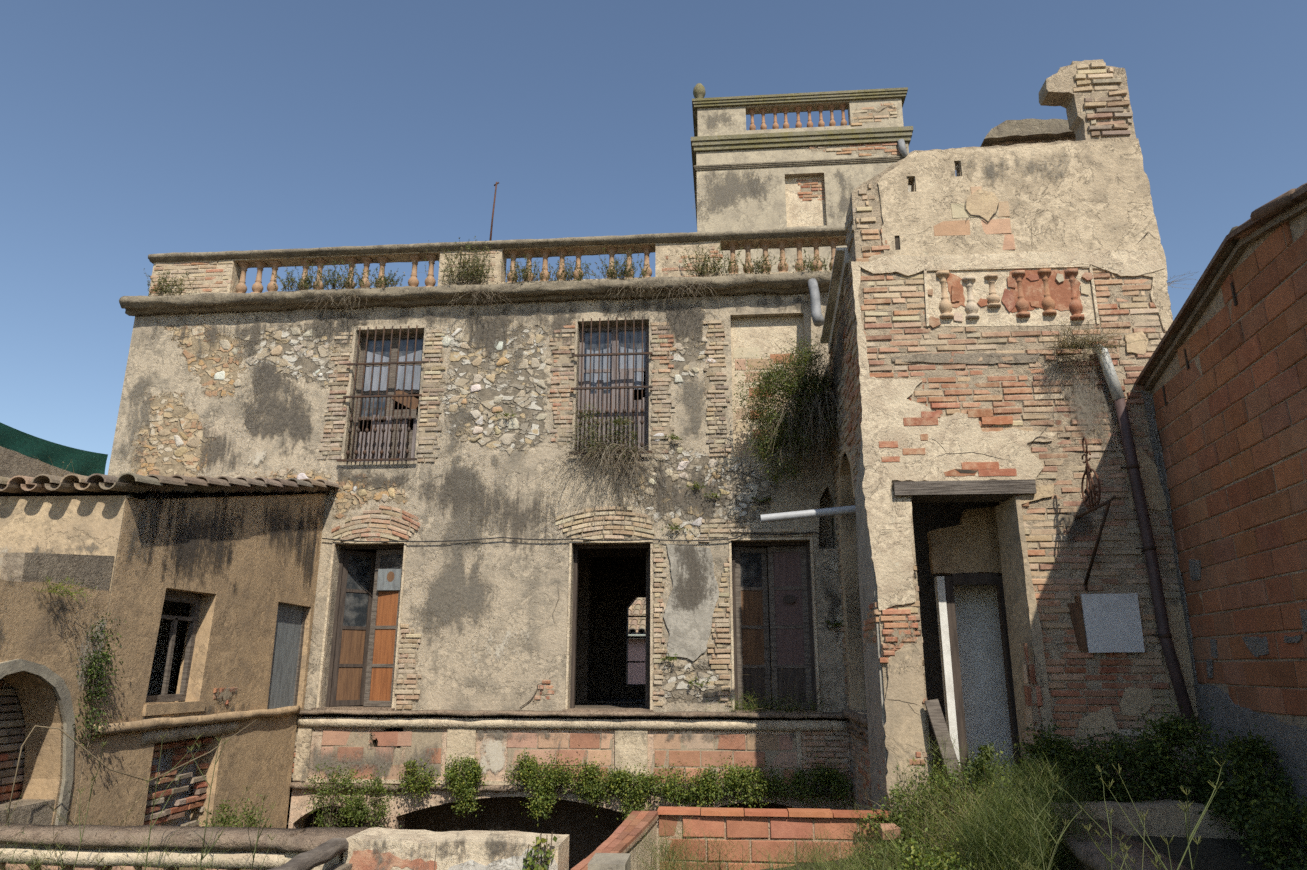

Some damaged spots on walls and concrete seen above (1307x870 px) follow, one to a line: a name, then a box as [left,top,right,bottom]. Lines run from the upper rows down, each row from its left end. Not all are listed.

flaking render [417,329,446,462]
flaking render [547,319,576,447]
damp [129,495,244,592]
damp [264,504,323,585]
damp [338,461,553,667]
peeling [555,506,812,706]
peeling [793,141,1173,819]
flaking render [349,849,437,870]